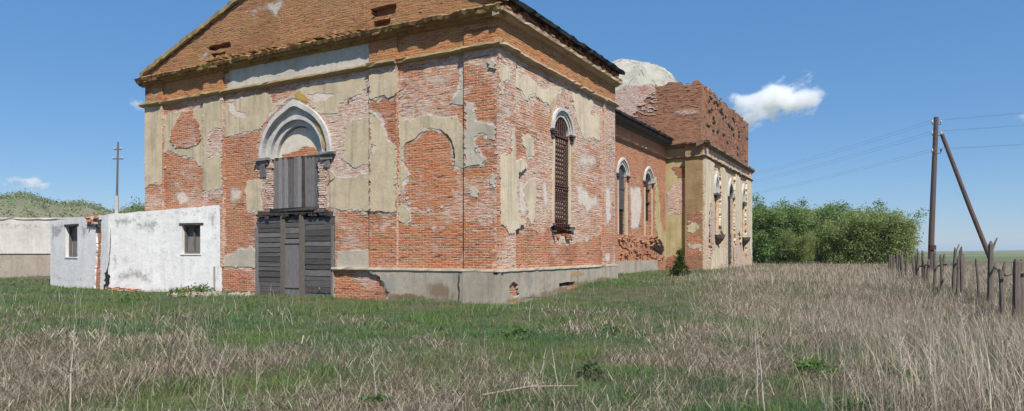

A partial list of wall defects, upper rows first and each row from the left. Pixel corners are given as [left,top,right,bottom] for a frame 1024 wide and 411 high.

spalling [615,83,657,117]
spalling [707,96,748,162]
peeling [144,128,263,293]
peeling [313,79,602,301]
spalling [618,165,721,270]